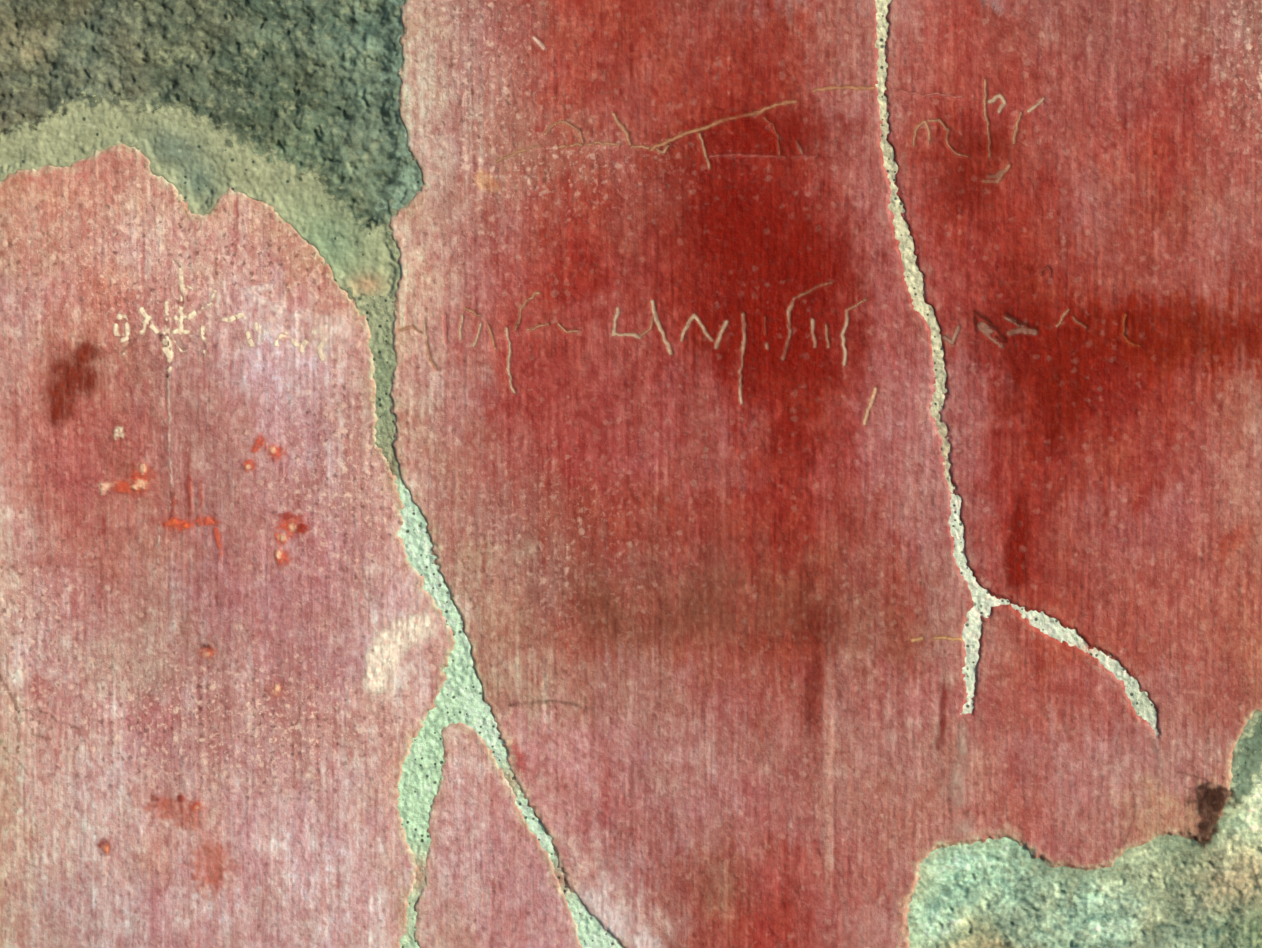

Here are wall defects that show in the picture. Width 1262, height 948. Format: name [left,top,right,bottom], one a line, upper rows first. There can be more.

spalling [0,0,423,302]
peeling [101,464,148,494]
peeling [244,436,282,471]
crack [875,0,1159,737]
spalling [907,711,1262,948]